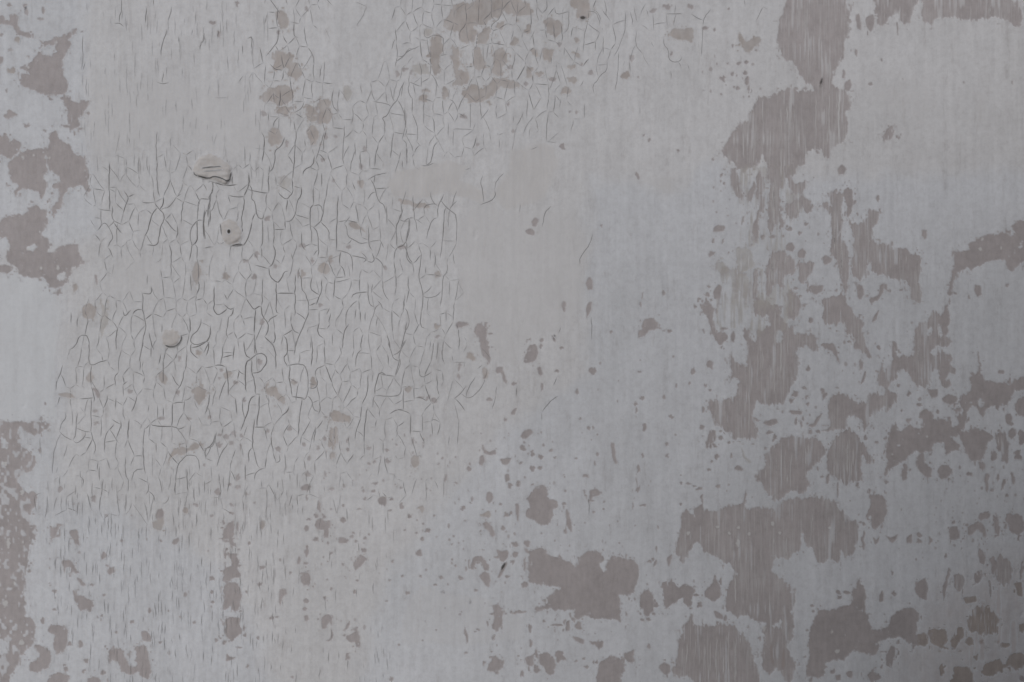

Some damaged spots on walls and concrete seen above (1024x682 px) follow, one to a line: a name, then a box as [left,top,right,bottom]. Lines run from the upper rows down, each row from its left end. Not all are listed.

peeling [0,6,100,296]
peeling [418,0,597,110]
crack [34,0,711,682]
peeling [468,0,1024,682]
peeling [0,414,98,682]